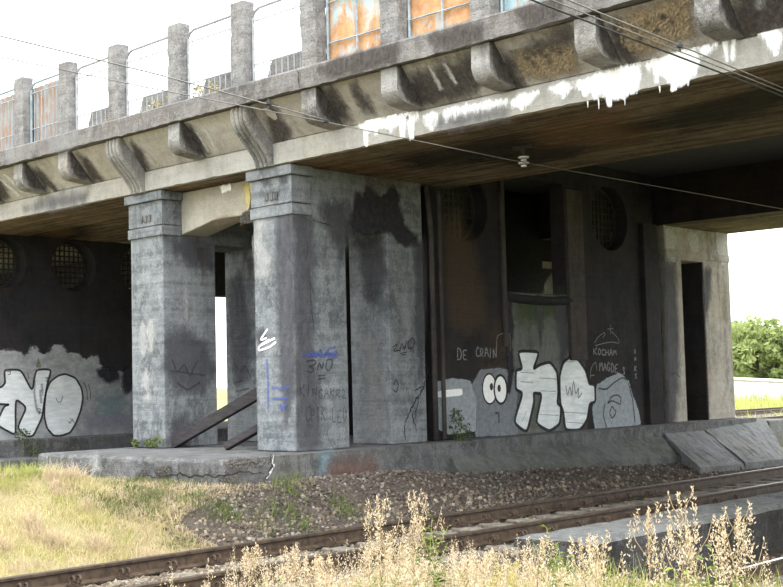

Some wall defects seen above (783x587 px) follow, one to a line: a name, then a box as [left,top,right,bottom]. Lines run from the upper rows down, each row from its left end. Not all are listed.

water stain [317,0,783,146]
water stain [395,132,590,170]
water stain [320,205,351,256]
water stain [359,239,387,302]
crack [147,454,275,483]